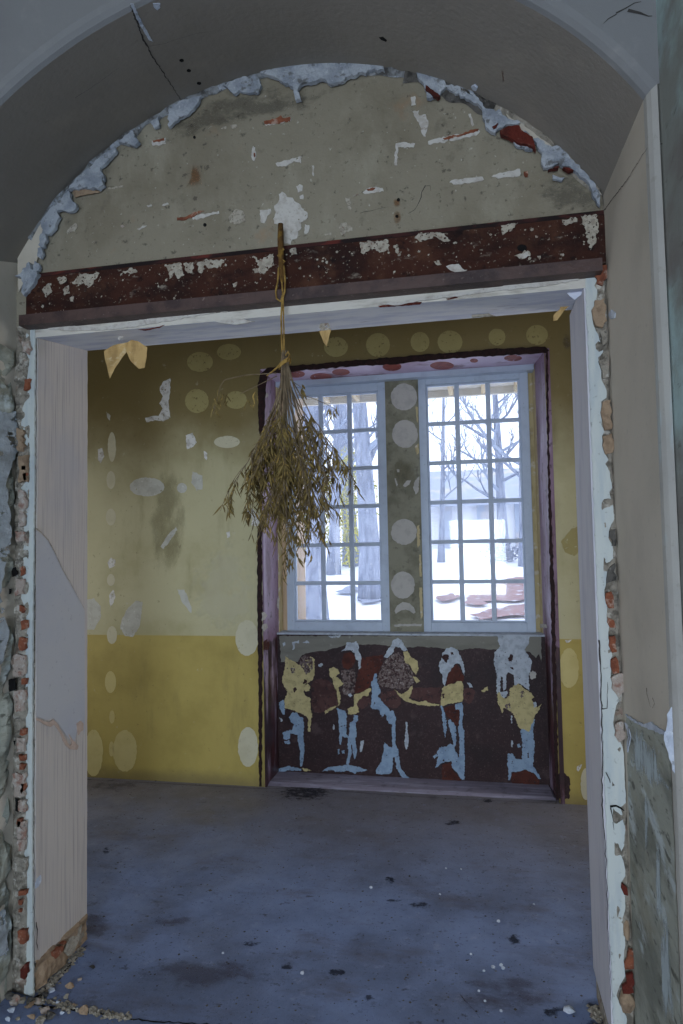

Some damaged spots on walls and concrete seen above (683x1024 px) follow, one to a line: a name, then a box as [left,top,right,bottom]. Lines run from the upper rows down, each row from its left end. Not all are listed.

crack [131,4,180,99]
flaking render [15,63,602,302]
peeling [48,311,255,331]
flaking render [145,379,171,422]
spalling [0,326,88,1003]
peeling [279,634,541,785]
flaking render [379,265,682,1024]